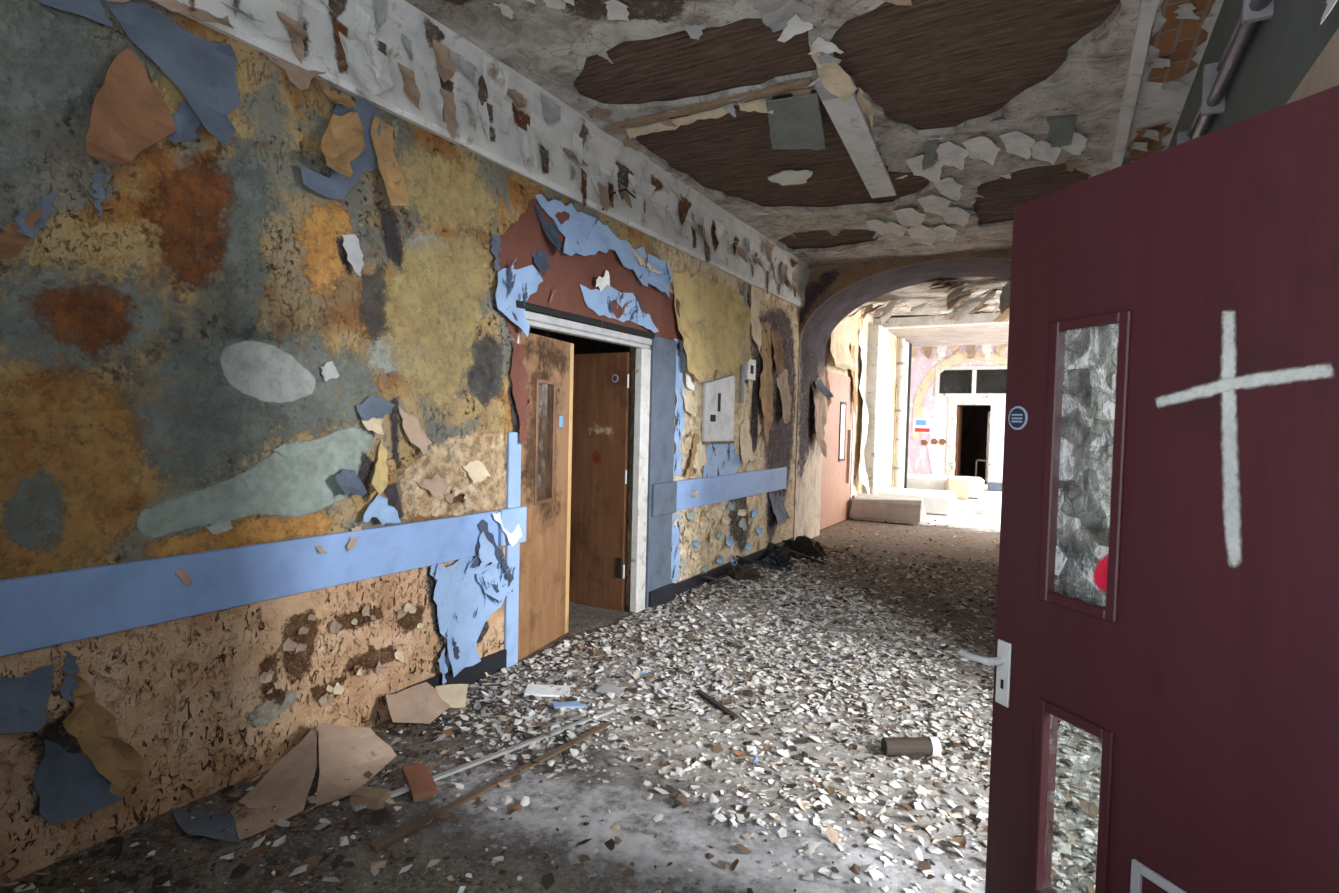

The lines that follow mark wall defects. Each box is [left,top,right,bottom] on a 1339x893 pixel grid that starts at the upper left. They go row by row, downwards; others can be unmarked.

peeling [221,0,309,64]
spalling [1147,0,1216,93]
spalling [1122,122,1172,166]
spalling [259,0,1120,708]
peeling [144,510,332,586]